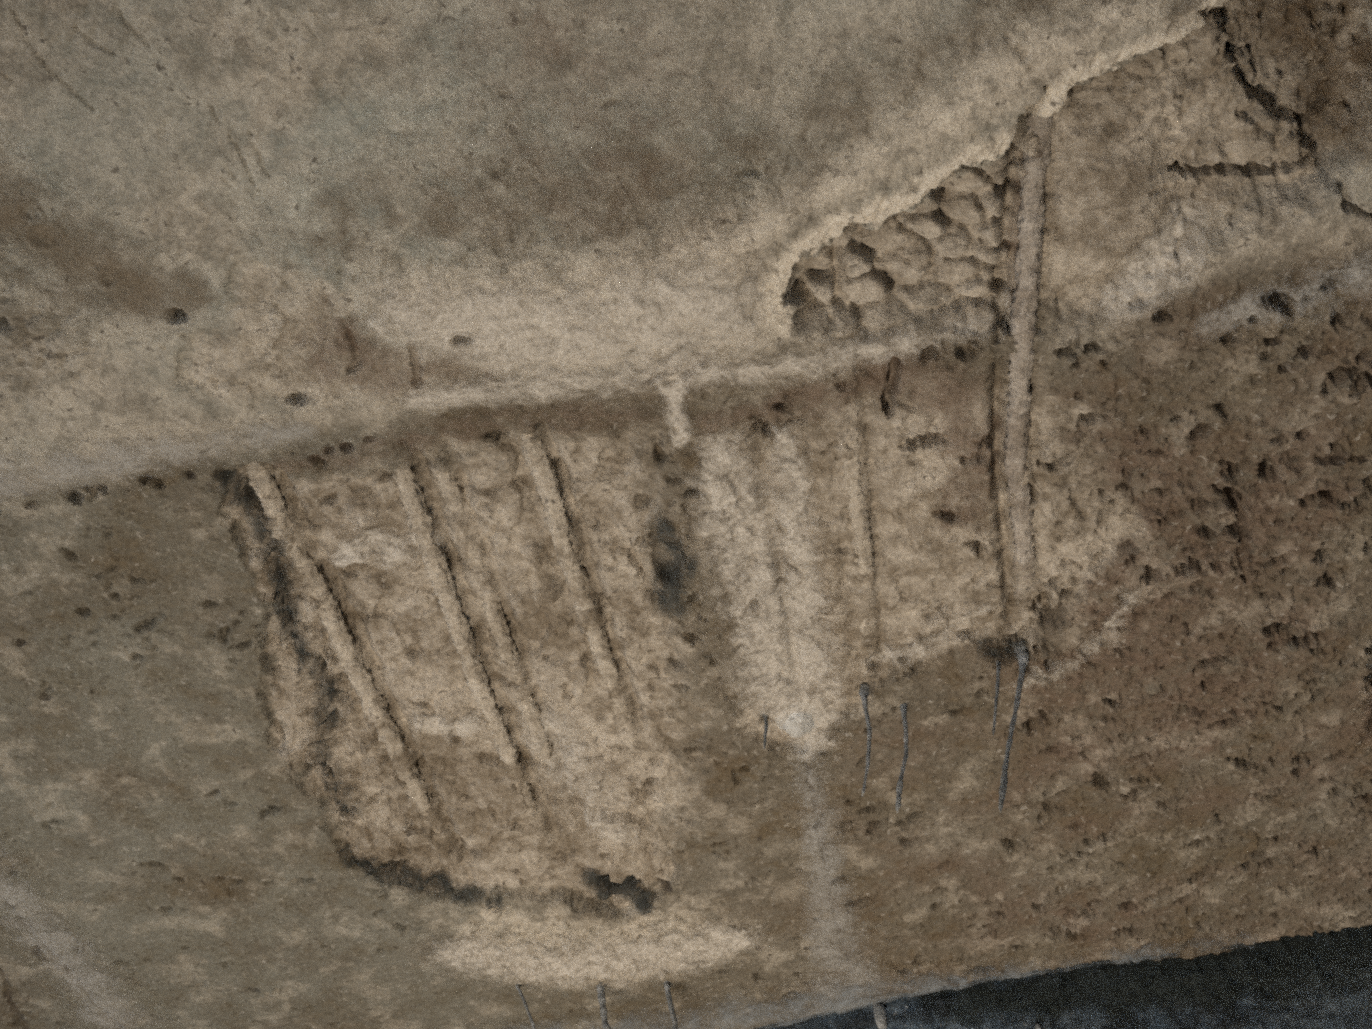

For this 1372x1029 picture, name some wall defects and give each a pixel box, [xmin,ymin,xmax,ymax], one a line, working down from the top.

water stain [369,272,998,759]
spalling [173,0,1372,924]
crack [1315,450,1372,467]
water stain [723,827,966,1029]